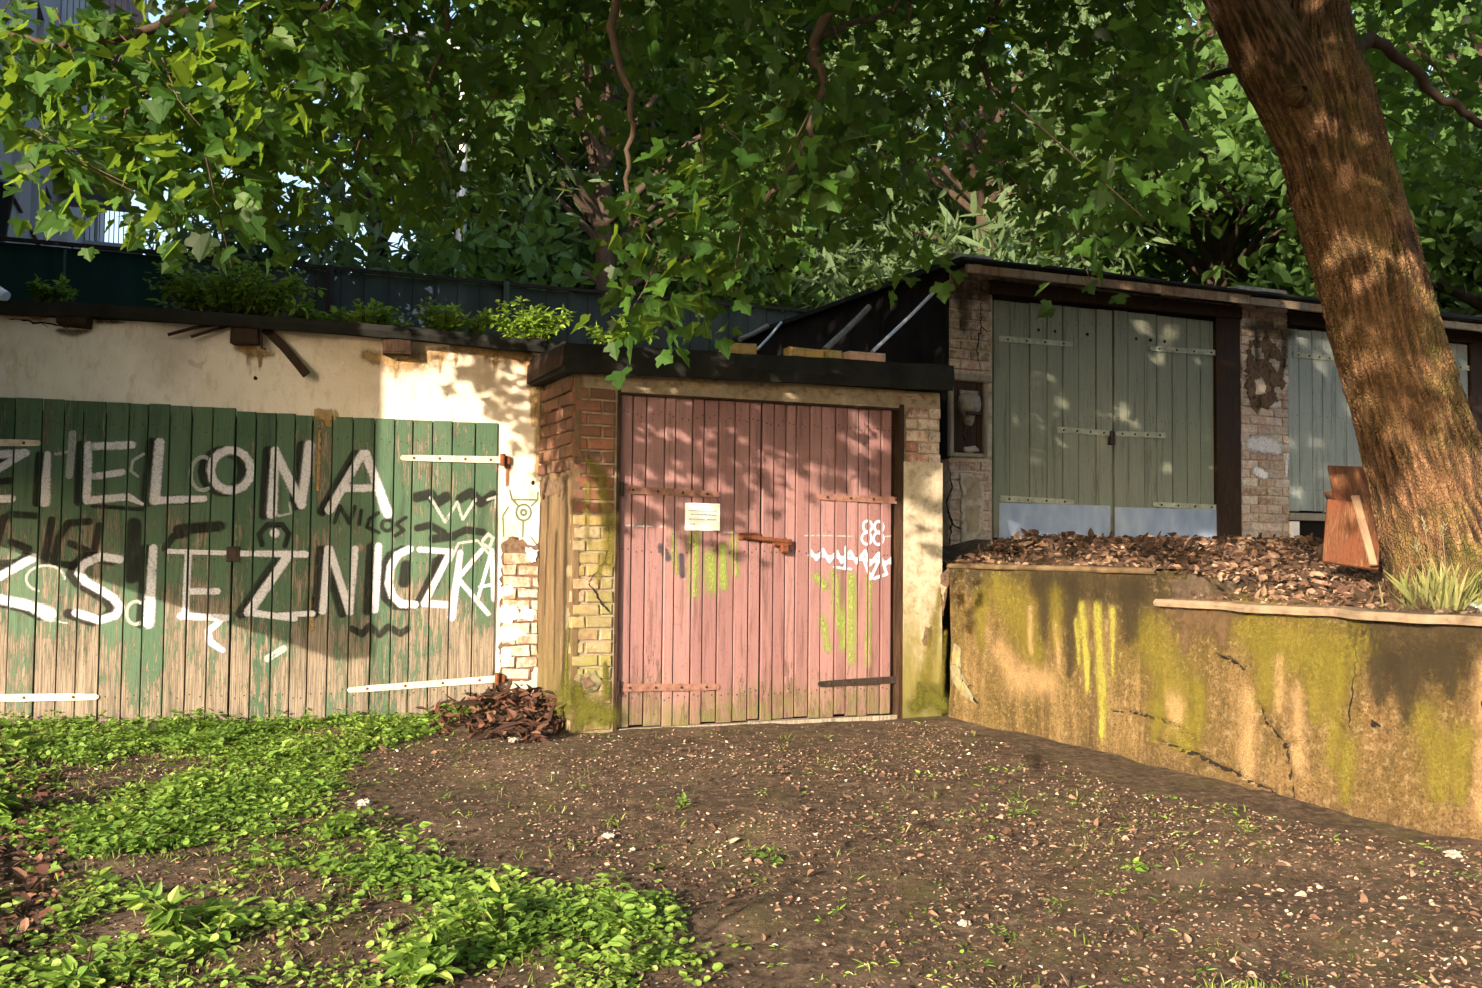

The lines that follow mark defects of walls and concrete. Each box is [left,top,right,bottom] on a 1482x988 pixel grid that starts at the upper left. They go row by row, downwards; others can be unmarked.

spalling [1244,335,1286,413]
damp [362,346,603,696]
spalling [498,536,539,683]
damp [976,591,987,648]
damp [1031,571,1146,692]
damp [1164,607,1242,653]
crack [1217,654,1246,670]
damp [1256,640,1276,701]
damp [1352,605,1482,721]
crack [1113,702,1302,798]
damp [1310,650,1354,802]